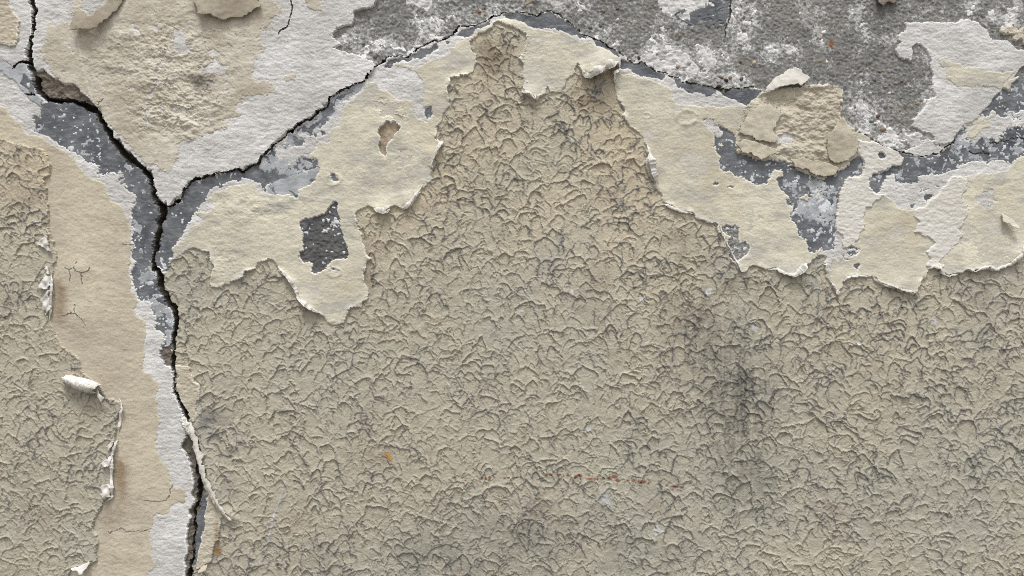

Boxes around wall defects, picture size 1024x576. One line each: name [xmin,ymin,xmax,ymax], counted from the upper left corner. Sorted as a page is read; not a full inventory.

peeling [0,0,232,576]
crack [12,0,754,576]
peeling [32,0,1024,326]